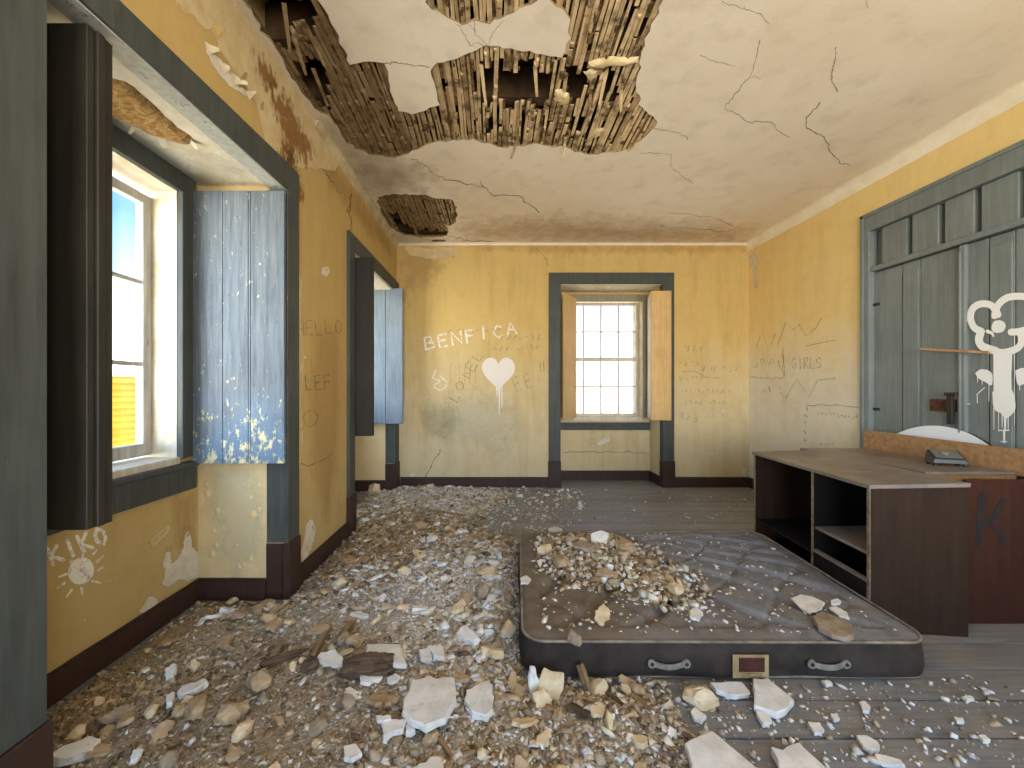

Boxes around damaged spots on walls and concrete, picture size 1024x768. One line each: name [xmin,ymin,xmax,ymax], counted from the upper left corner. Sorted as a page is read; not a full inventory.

flaking render [174,0,662,171]
crack [700,1,849,166]
crack [649,128,692,183]
crack [412,159,540,213]
flaking render [377,194,458,242]
peeling [301,519,316,562]
peeling [139,525,198,613]